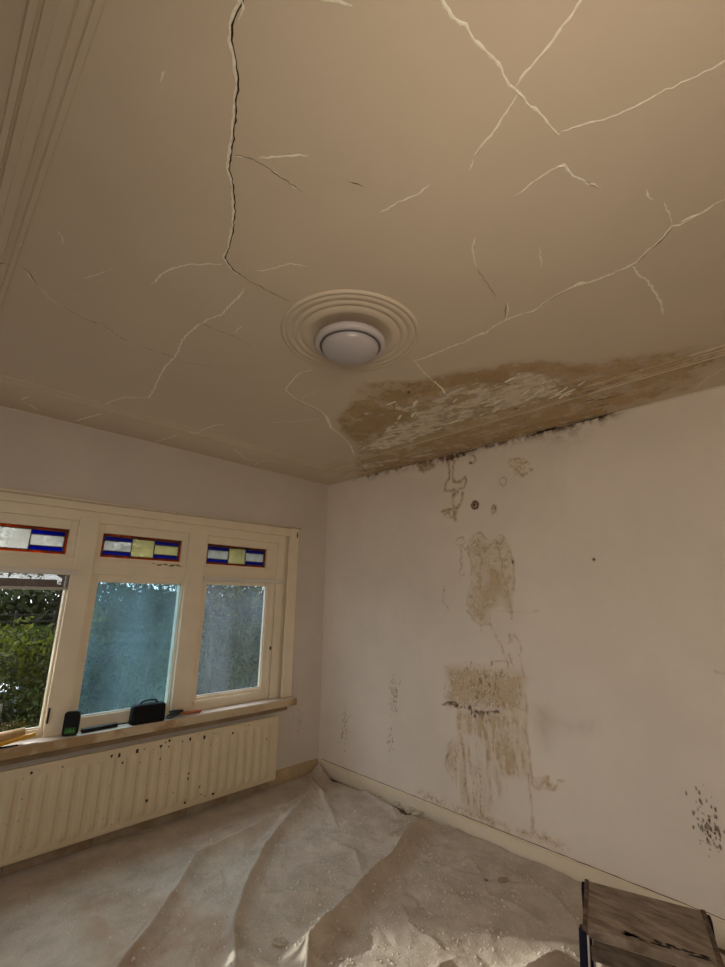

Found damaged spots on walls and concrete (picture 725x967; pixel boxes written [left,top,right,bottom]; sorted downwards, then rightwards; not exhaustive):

crack [321,0,352,8]
crack [440,0,725,170]
crack [0,0,309,421]
crack [381,184,431,212]
crack [515,163,601,196]
crack [414,189,725,399]
peeling [358,372,585,469]
water stain [345,354,712,477]
water stain [686,787,725,857]